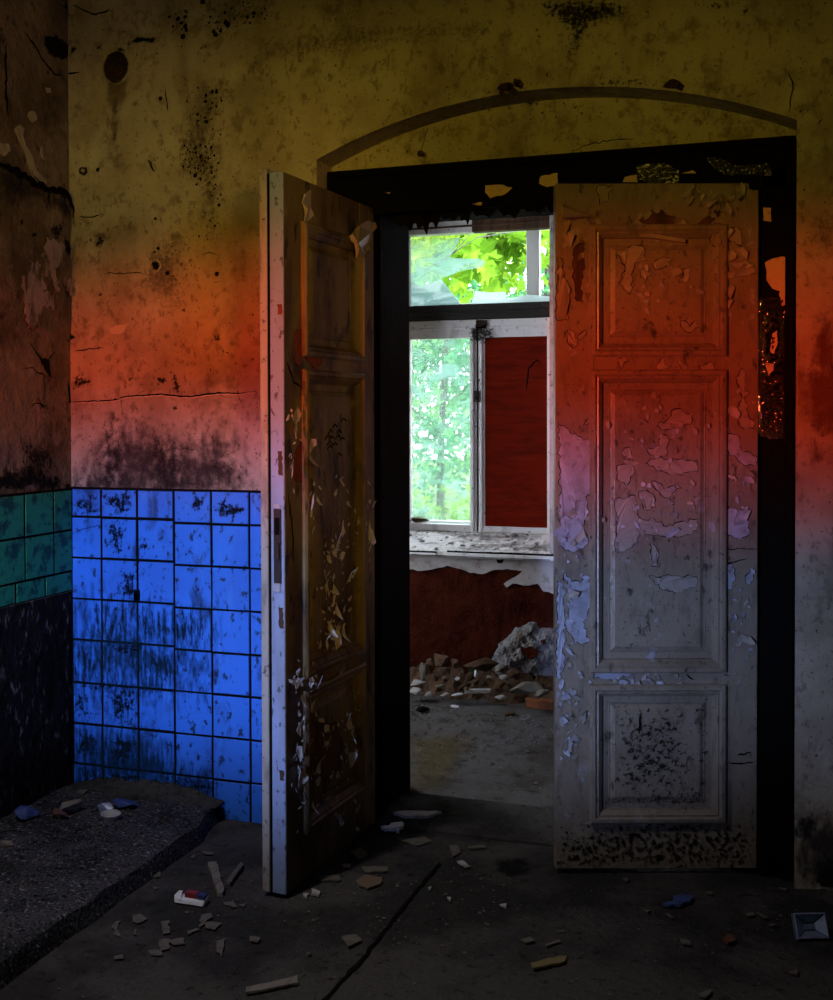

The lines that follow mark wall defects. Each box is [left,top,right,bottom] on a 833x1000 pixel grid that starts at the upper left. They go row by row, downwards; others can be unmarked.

leakage [543,0,627,62]
crack [0,162,99,218]
peeling [475,185,512,205]
peeling [539,173,558,187]
flaking render [21,233,76,331]
crack [71,391,256,408]
leakage [72,490,136,555]
leakage [214,500,244,517]
leakage [120,543,150,597]
flaking render [410,405,710,760]
leakage [75,652,138,724]
crack [322,863,441,1000]